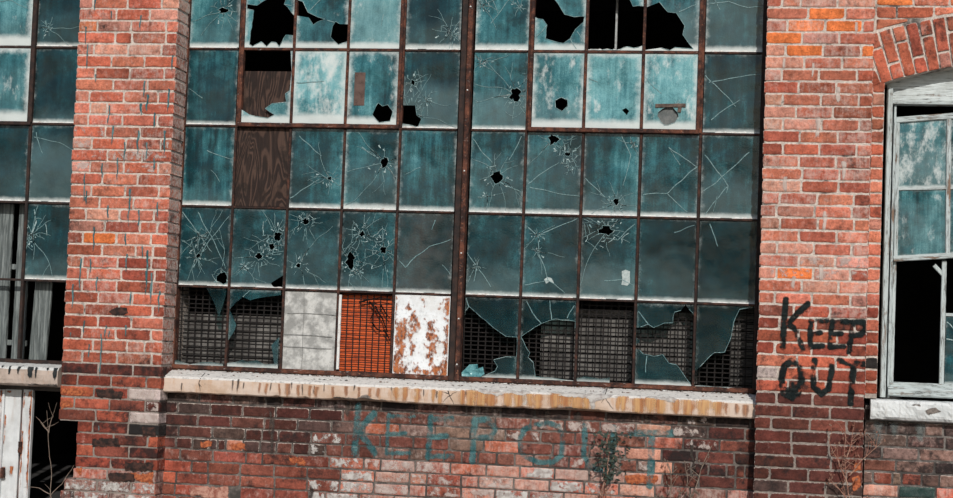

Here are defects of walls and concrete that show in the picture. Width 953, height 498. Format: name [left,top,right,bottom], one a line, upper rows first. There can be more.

corrosion [392,295,451,376]
peeling [556,422,634,432]
peeling [673,417,716,449]
peeling [289,434,341,466]
peeling [309,458,615,498]
spalling [608,462,658,485]
spalling [852,463,861,491]